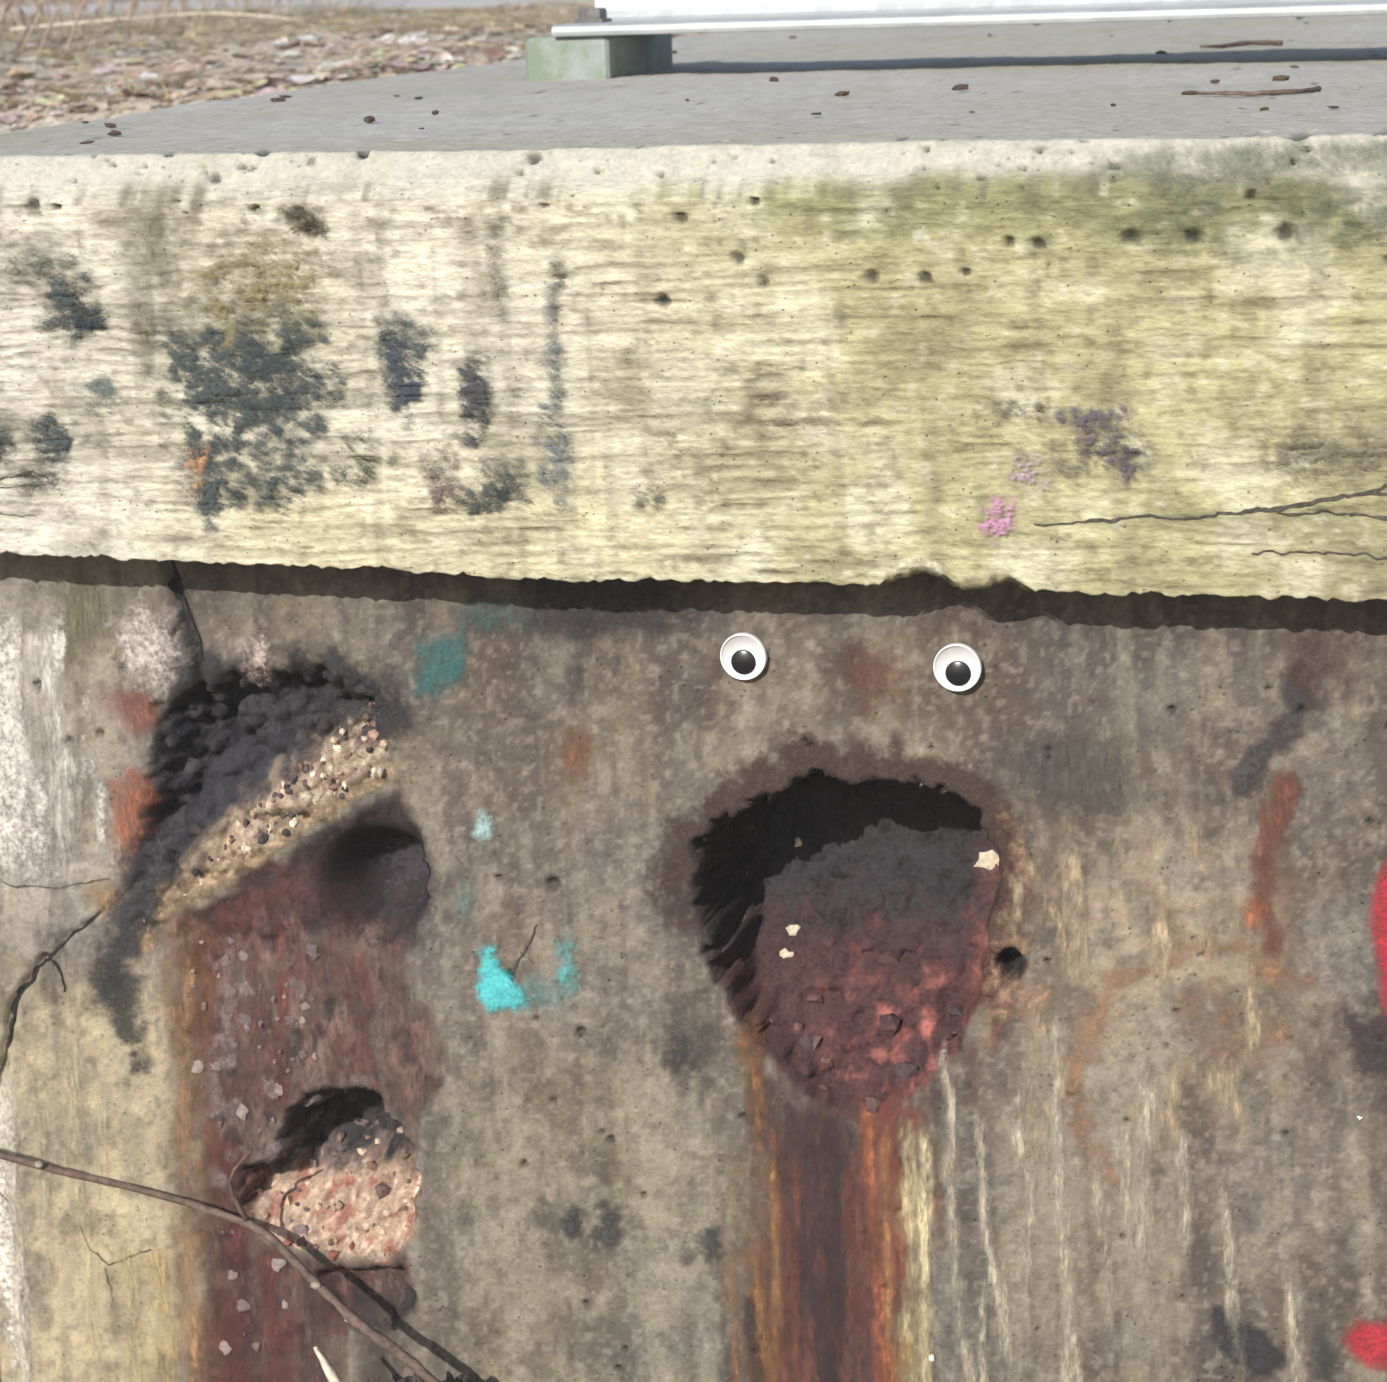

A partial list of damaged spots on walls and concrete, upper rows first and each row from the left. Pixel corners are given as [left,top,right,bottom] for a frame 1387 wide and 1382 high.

crack [1034,483,1387,526]
crack [1251,550,1387,560]
crack [0,878,139,1071]
peeling [219,1332,260,1356]
spalling [132,668,431,1331]
corrosion [171,893,442,1382]
corrosion [729,1030,920,1382]
spalling [650,736,1049,1119]
damp [901,1050,956,1382]
damp [962,1125,1010,1382]
damp [1013,1025,1082,1382]
damp [1210,1200,1334,1381]